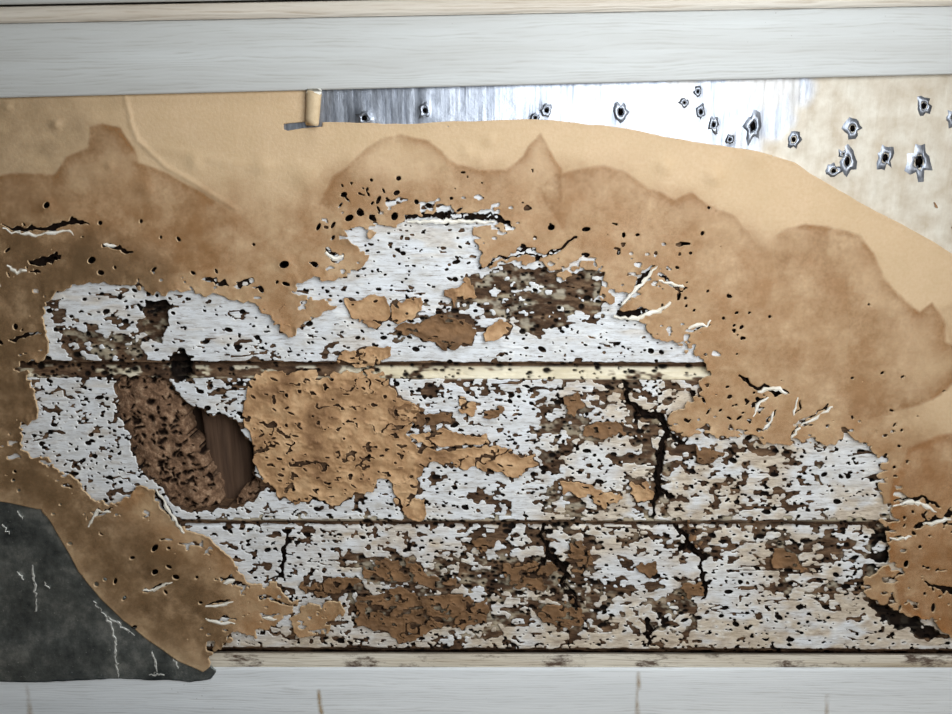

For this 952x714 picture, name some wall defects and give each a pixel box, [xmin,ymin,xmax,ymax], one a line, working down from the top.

water stain [102,125,170,177]
water stain [0,232,117,315]
peeling [19,194,720,363]
water stain [120,533,220,641]
peeling [2,375,952,650]
crack [537,524,580,608]
crack [620,381,708,600]